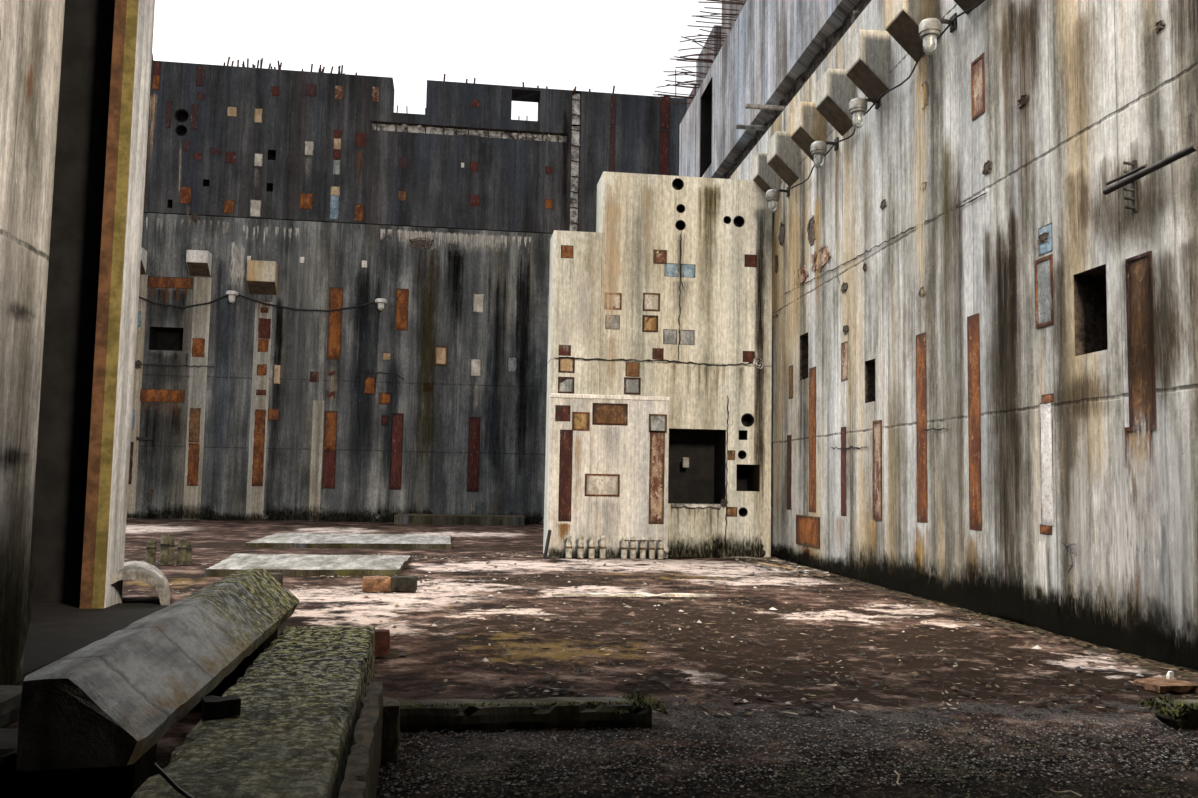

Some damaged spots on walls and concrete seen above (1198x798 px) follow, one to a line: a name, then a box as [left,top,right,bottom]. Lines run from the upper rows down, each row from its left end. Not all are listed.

damp [1011,0,1037,164]
damp [381,229,531,325]
damp [475,264,530,467]
damp [704,190,716,240]
damp [547,215,1198,670]
damp [941,158,962,518]